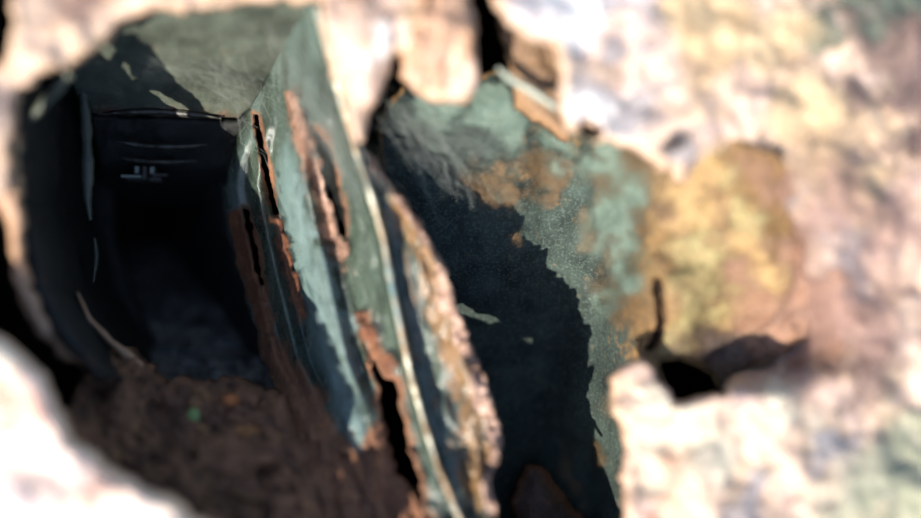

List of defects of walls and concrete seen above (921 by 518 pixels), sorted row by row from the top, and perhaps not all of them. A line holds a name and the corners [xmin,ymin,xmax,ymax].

spalling [578,117,602,140]
crack [650,244,666,348]